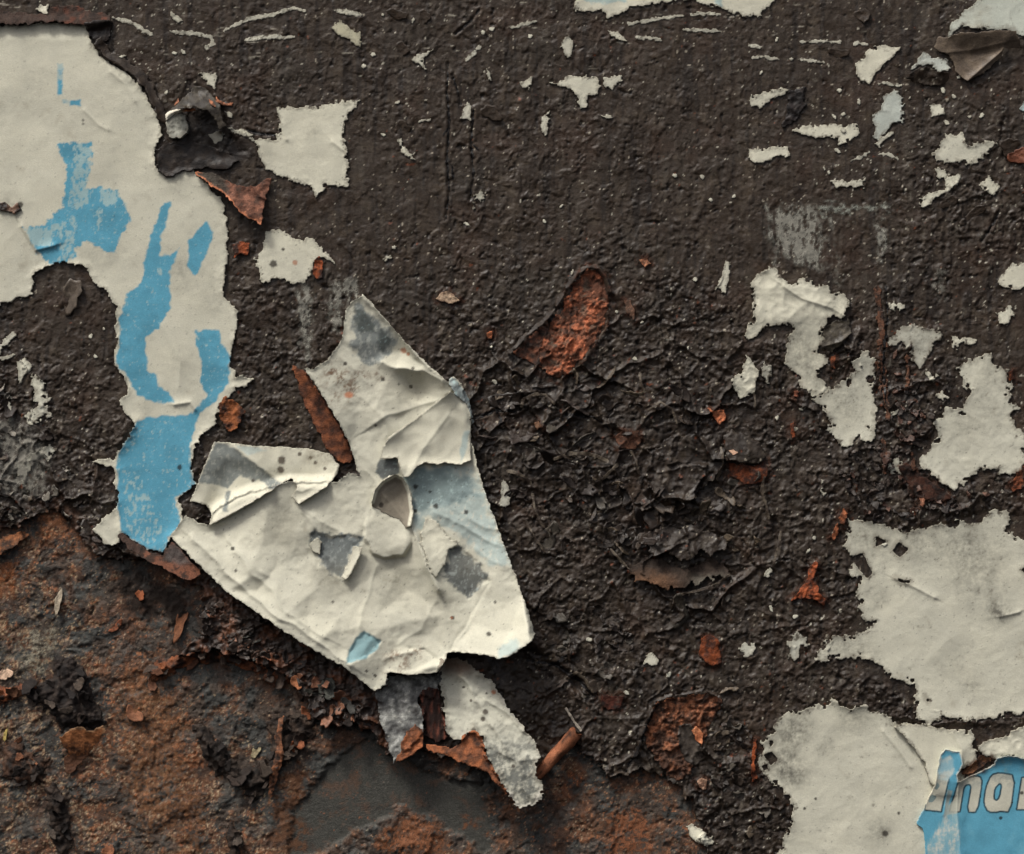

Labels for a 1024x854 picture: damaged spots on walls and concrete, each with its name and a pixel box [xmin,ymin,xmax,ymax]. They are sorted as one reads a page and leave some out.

peeling [84,19,113,42]
peeling [171,86,227,130]
peeling [0,202,21,214]
corrosion [195,171,272,225]
corrosion [506,264,612,384]
crack [469,408,517,428]
peeling [837,350,1009,524]
corrosion [0,628,107,774]
corrosion [192,706,316,854]
peeling [199,601,379,728]
crack [526,655,593,696]
corrosion [631,686,723,790]